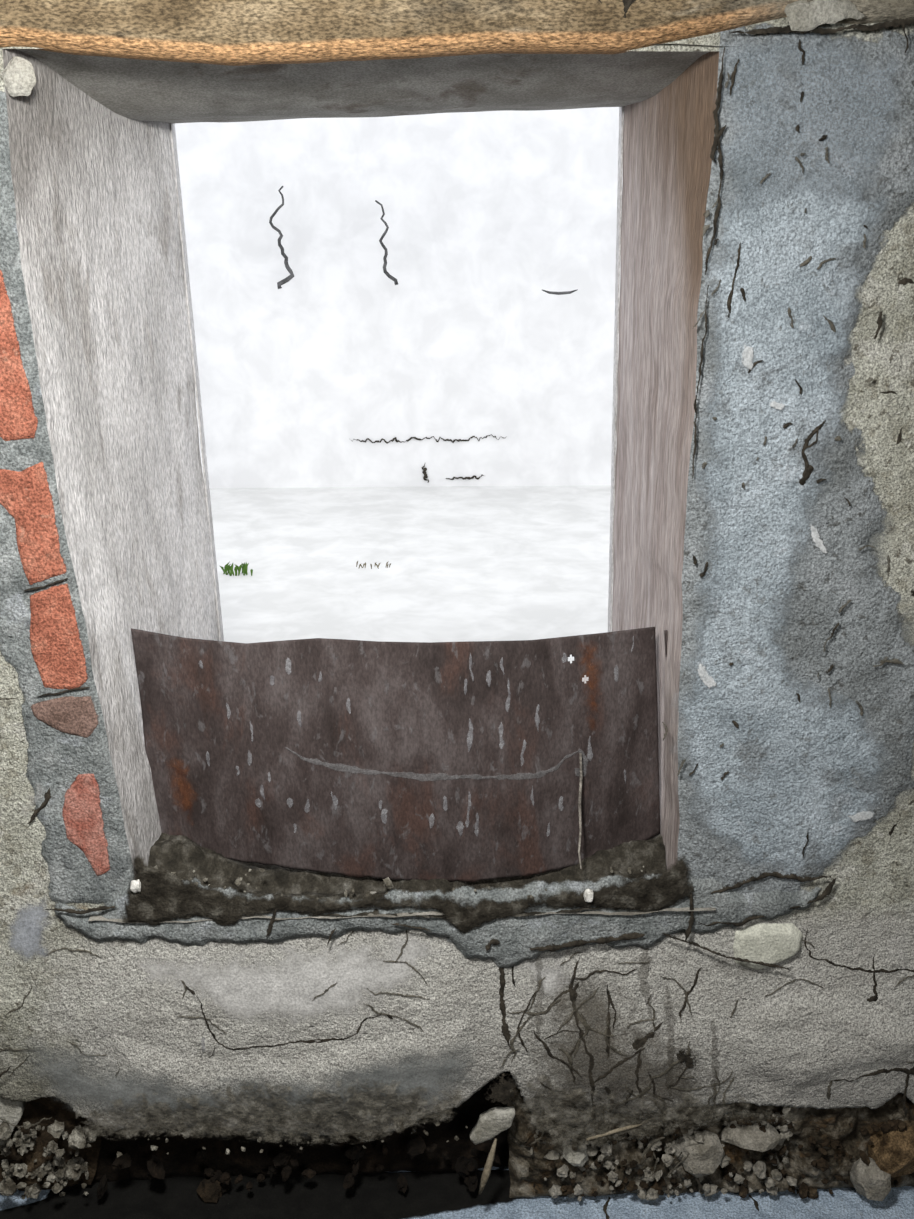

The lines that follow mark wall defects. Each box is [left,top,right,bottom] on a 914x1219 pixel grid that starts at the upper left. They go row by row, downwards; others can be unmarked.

flaking render [0,56,134,904]
crack [0,1117,52,1128]
crack [0,1040,121,1078]
crack [45,947,99,957]
crack [177,930,430,1058]
crack [498,952,720,1148]
water stain [530,966,693,1108]
crack [698,832,914,1002]
crack [826,1062,914,1116]